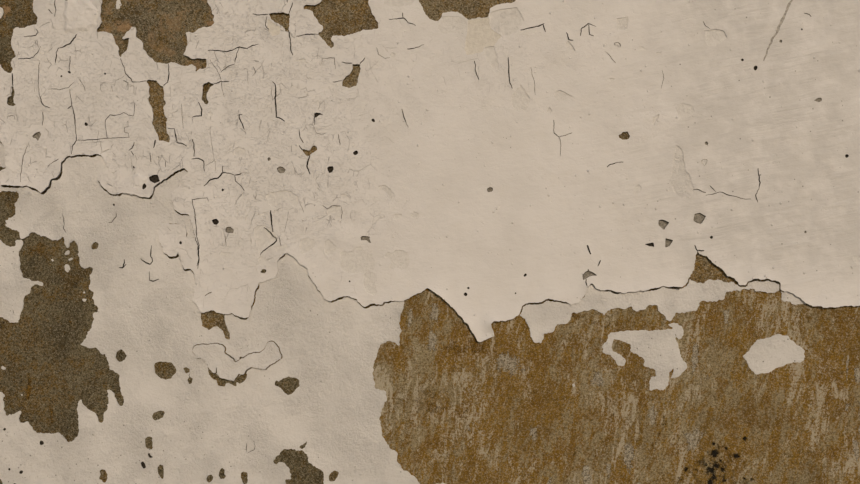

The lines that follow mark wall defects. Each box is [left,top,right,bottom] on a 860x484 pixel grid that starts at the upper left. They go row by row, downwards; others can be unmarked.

peeling [0,0,37,73]
peeling [97,0,214,71]
peeling [304,0,378,48]
peeling [419,0,515,21]
crack [208,0,319,174]
crack [12,29,281,269]
peeling [0,153,124,445]
crack [119,245,159,282]
peeling [192,341,281,381]
peeling [372,236,860,484]
peeling [273,449,324,484]
leakage [678,429,753,484]